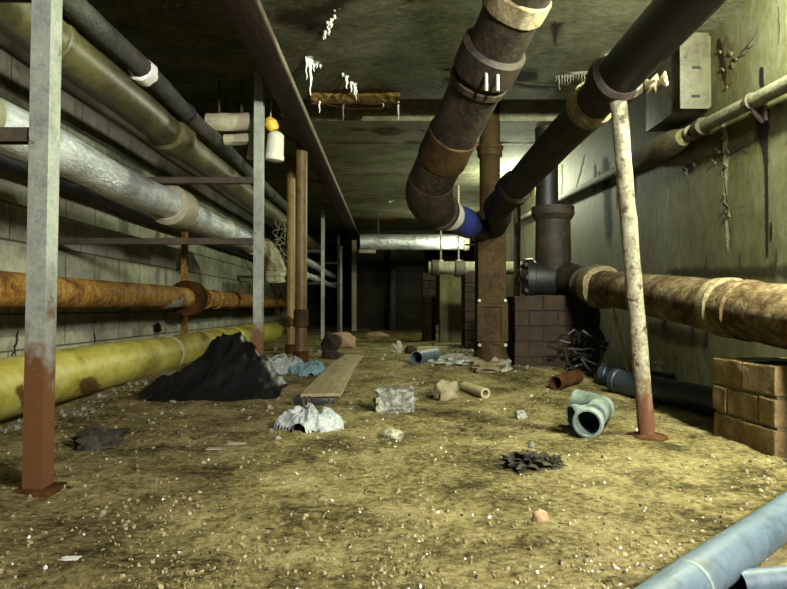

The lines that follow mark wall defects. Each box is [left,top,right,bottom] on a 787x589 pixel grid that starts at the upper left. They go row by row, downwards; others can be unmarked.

water stain [278,0,348,40]
crack [736,31,757,61]
water stain [305,56,322,96]
water stain [342,73,357,100]
water stain [556,71,588,89]
water stain [668,103,787,278]